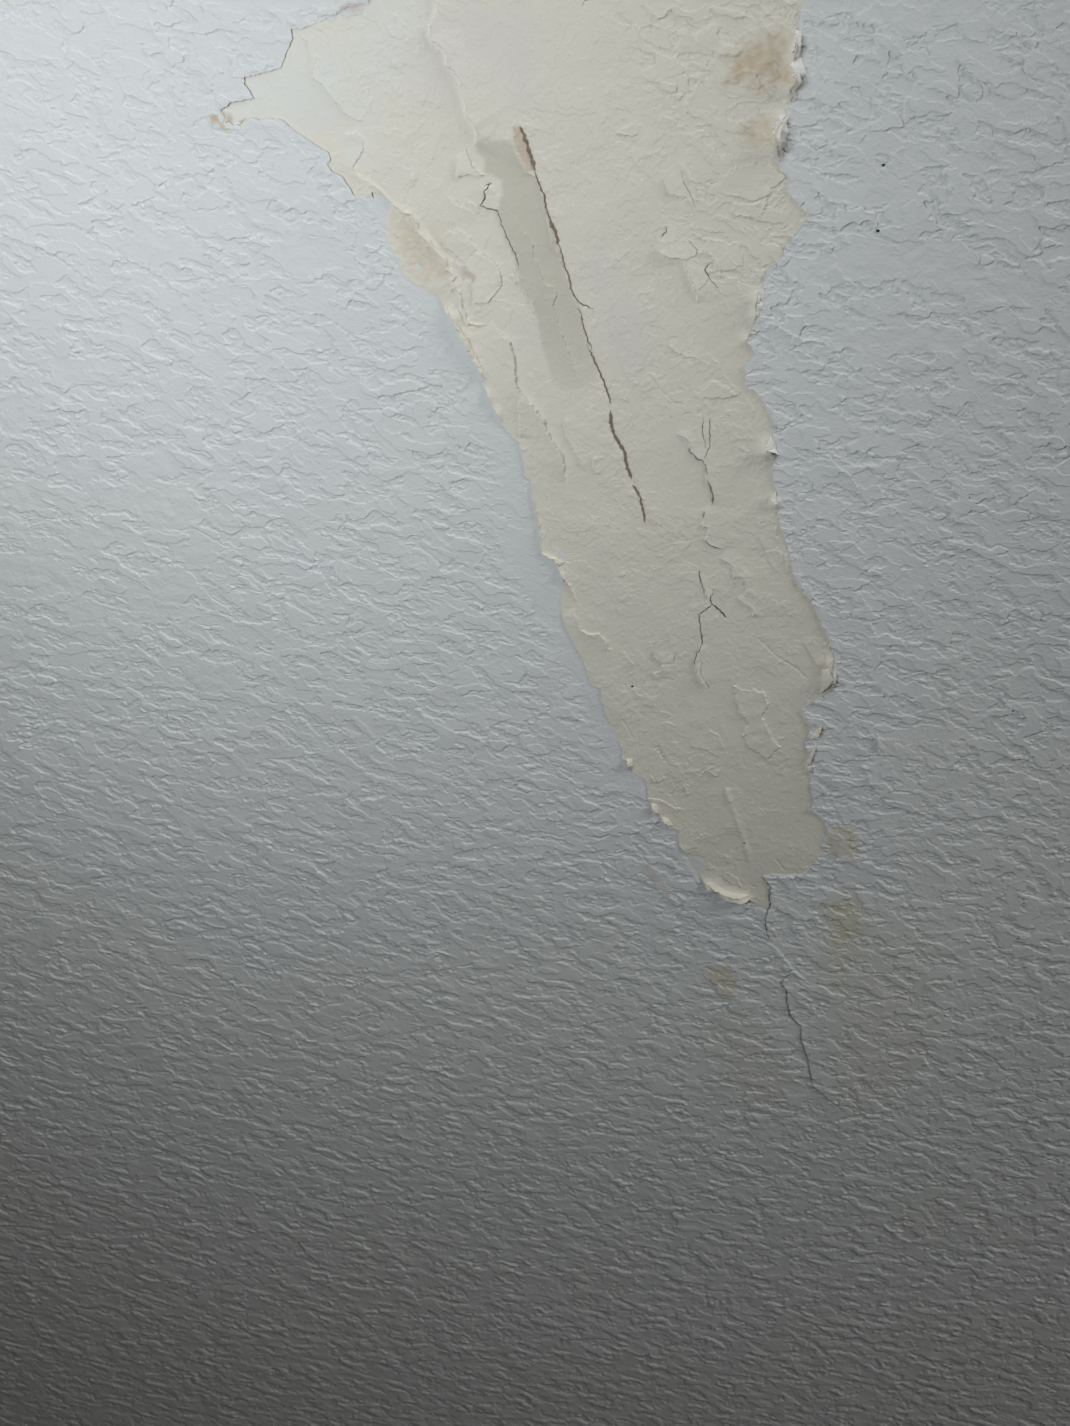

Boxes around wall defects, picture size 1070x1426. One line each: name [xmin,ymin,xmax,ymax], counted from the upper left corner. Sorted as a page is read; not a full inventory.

peeling [212,0,842,908]
crack [780,974,847,1113]